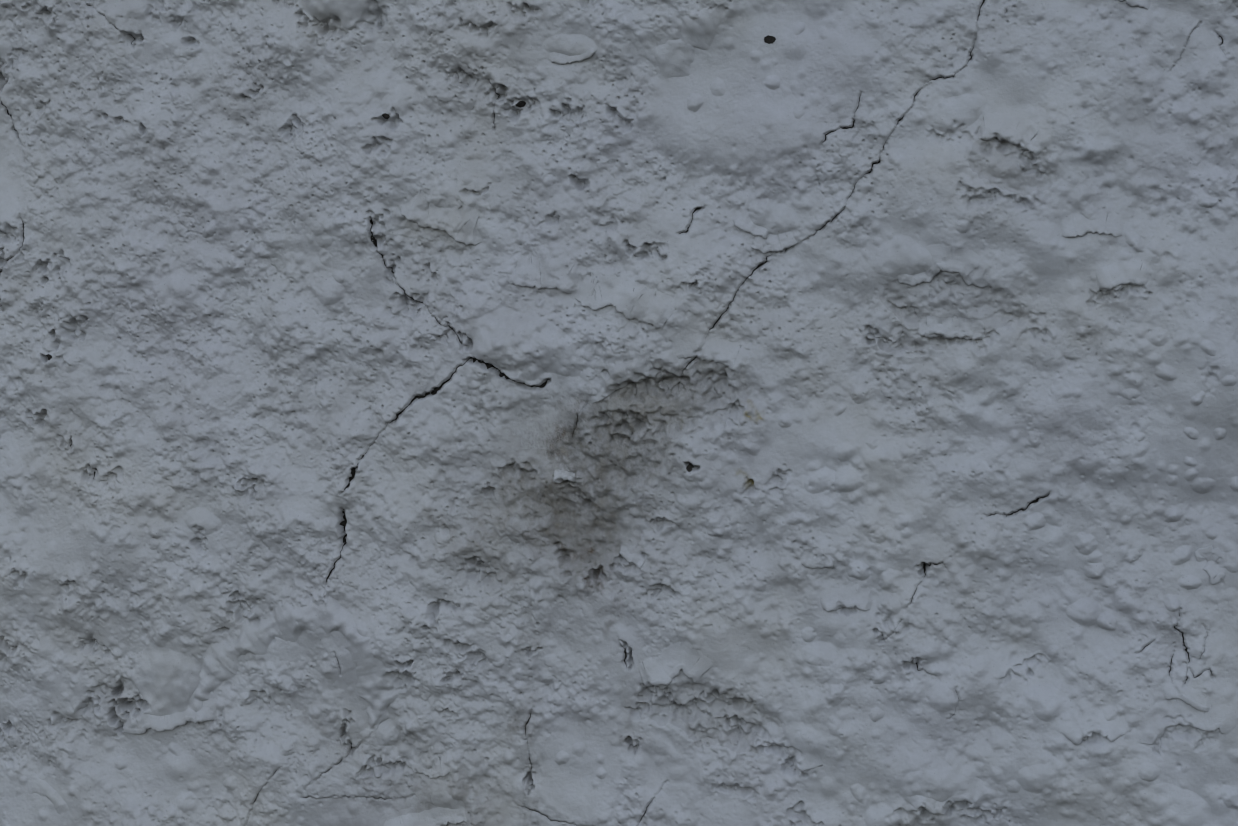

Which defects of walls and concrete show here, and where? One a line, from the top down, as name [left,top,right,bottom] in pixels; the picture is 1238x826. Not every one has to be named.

crack [678,0,985,391]
crack [324,212,550,597]